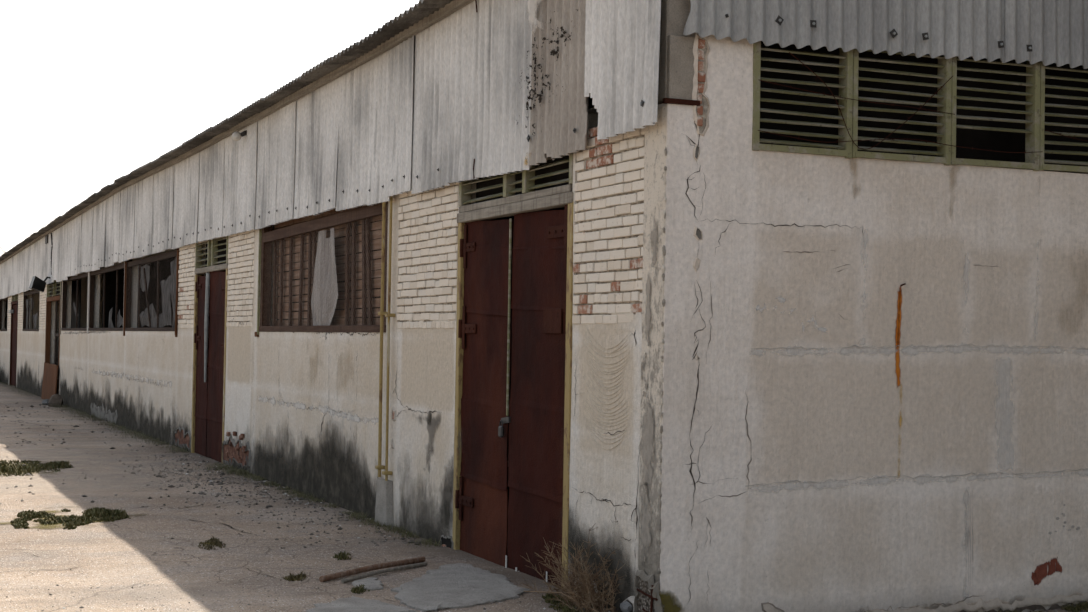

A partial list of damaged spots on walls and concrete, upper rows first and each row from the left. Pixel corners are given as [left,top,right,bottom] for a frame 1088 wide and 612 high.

flaking render [692,33,710,161]
crack [681,121,864,255]
rust [895,283,906,386]
water stain [60,382,189,451]
water stain [227,430,376,520]
crack [687,282,752,600]